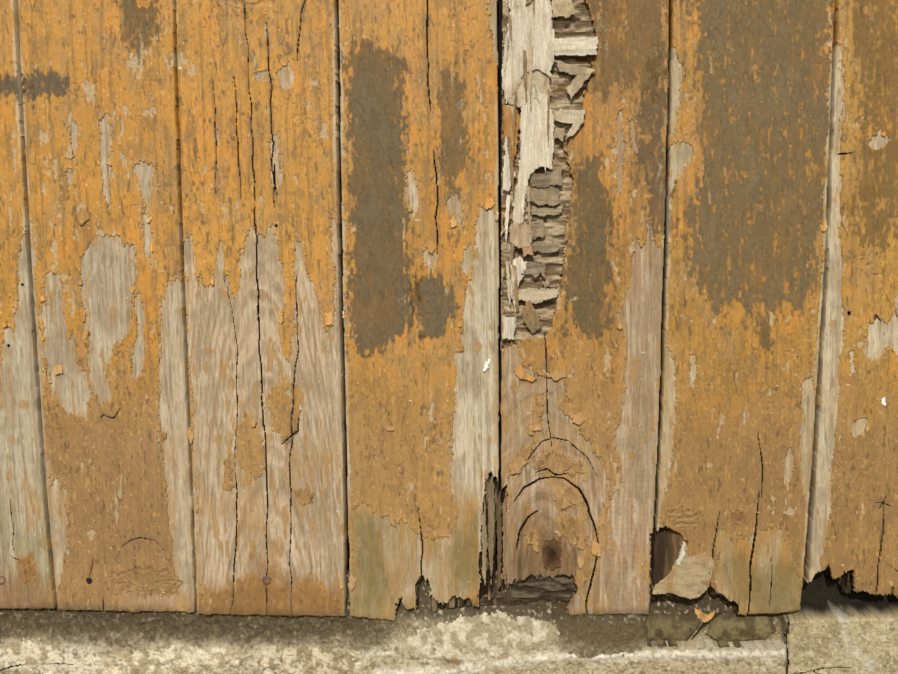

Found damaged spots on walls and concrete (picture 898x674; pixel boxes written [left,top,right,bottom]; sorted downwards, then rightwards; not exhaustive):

water stain [0,69,69,101]
peeling [0,159,156,609]
crack [213,6,300,611]
peeling [111,192,677,621]
water stain [341,39,460,358]
crack [424,0,432,111]
crack [432,160,440,254]
water stain [437,113,471,195]
peeling [521,168,563,288]
crack [513,333,599,614]
water stain [680,0,843,353]
peeling [714,43,898,616]